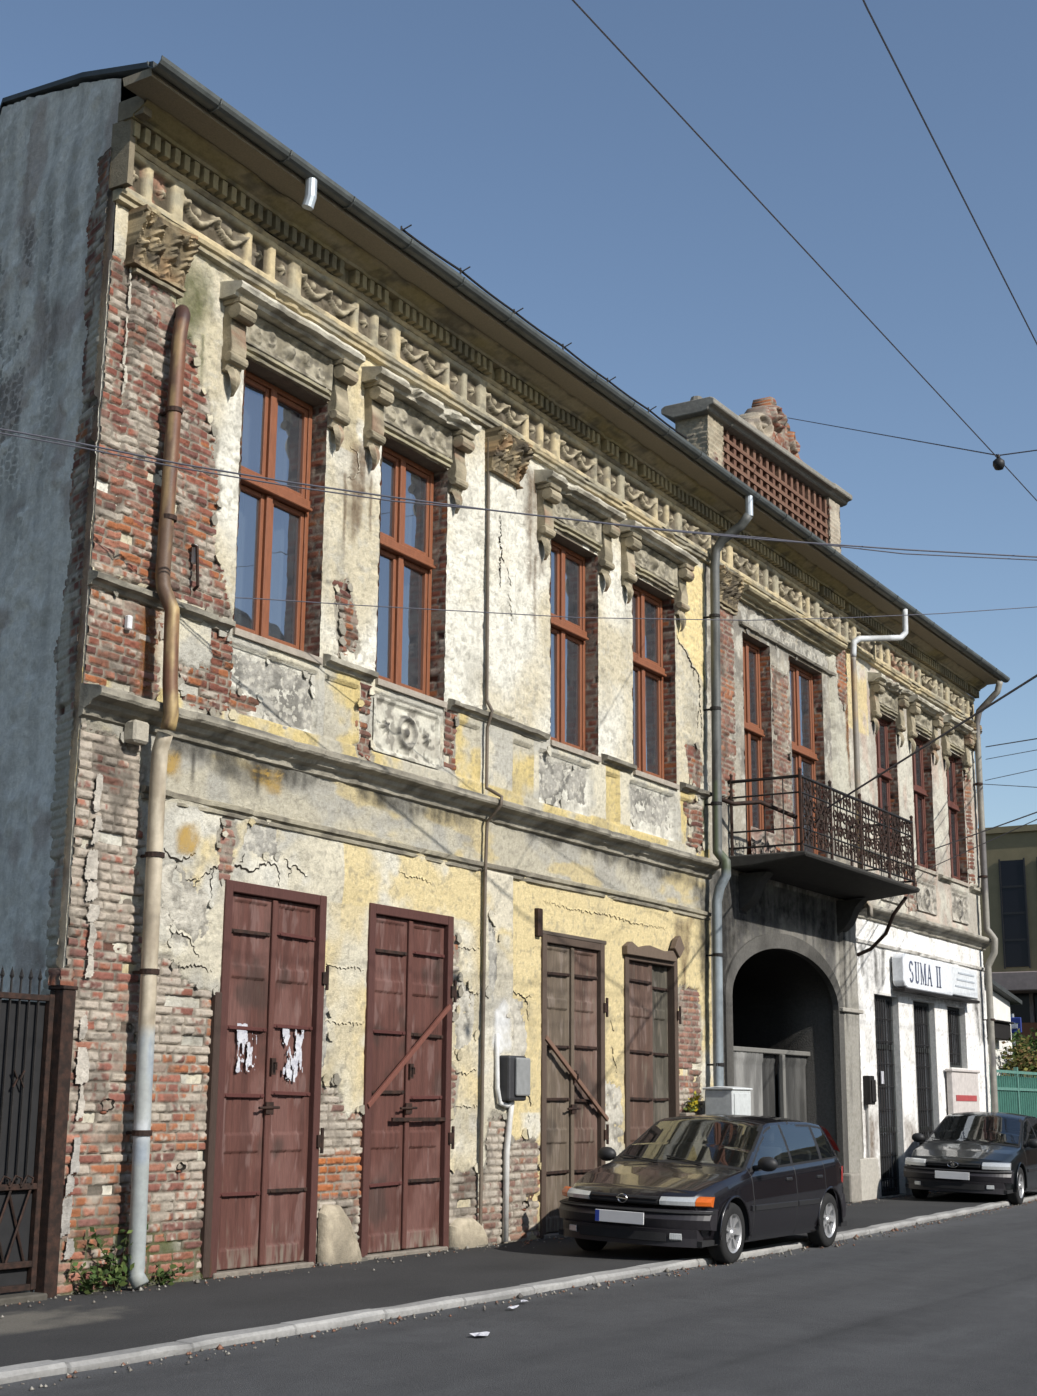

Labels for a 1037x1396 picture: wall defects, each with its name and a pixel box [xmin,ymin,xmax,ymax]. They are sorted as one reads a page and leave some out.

flaking render [332,579,358,660]
flaking render [40,147,318,1295]
flaking render [355,682,376,761]
flaking render [720,606,848,853]
flaking render [630,742,706,853]
crack [162,847,308,972]
flaking render [678,986,703,1115]
flaking render [315,985,365,1264]
flaking render [449,1113,541,1244]